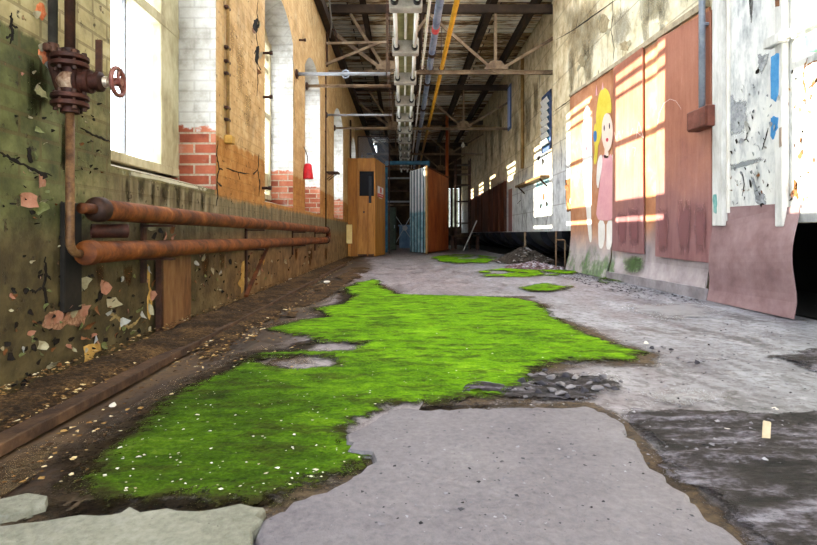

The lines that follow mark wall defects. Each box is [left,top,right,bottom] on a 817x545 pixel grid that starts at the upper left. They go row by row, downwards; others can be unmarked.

spalling [33,0,48,21]
spalling [38,43,48,68]
peeling [755,54,769,74]
peeling [730,62,817,207]
crack [0,152,52,176]
peeling [20,172,50,215]
crack [216,145,260,205]
peeling [140,264,157,320]
flaking render [27,277,123,362]